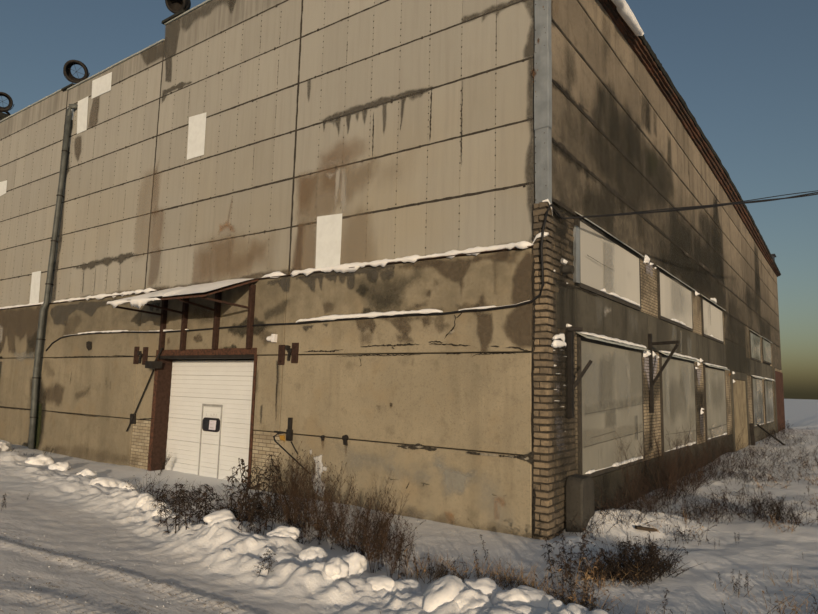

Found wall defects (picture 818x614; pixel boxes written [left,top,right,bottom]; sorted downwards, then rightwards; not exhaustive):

water stain [141,0,235,102]
water stain [323,87,432,134]
water stain [462,0,535,225]
water stain [583,90,673,231]
water stain [228,318,269,342]
water stain [240,250,534,352]
water stain [662,200,725,309]
water stain [746,248,760,315]